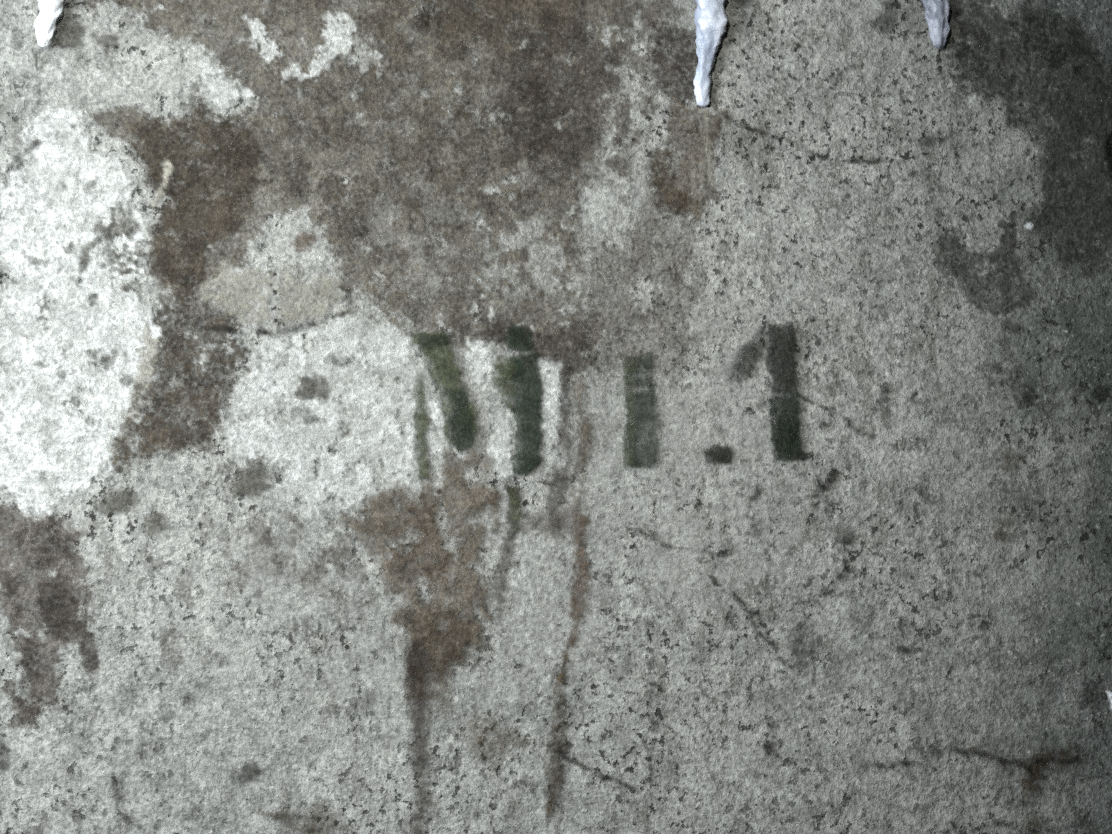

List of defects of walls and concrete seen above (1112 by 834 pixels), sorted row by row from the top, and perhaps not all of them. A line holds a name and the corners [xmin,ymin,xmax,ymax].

leakage [90,0,729,465]
leakage [0,506,98,727]
rust [343,448,522,834]
rust [537,368,590,817]